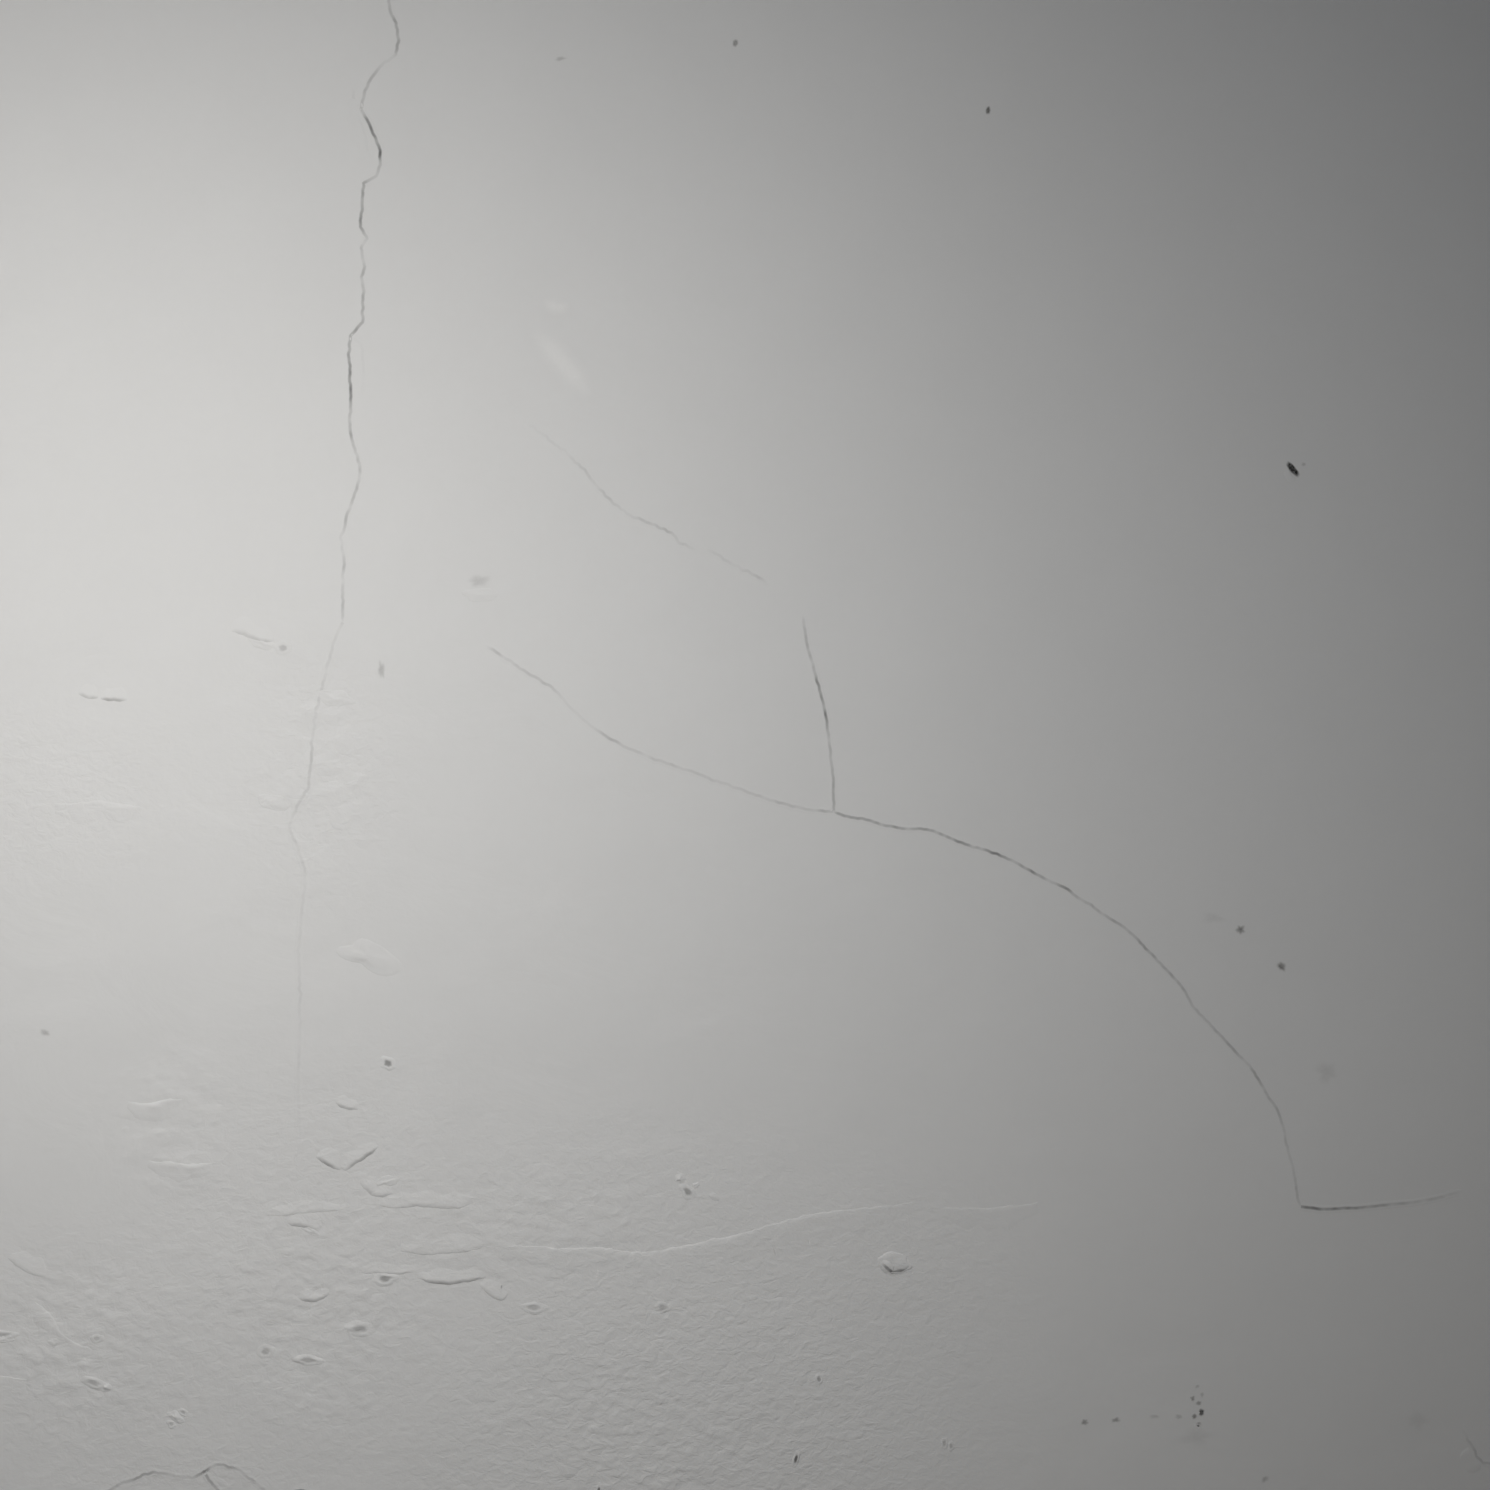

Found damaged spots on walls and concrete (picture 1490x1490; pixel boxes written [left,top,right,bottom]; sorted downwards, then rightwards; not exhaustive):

crack [285,0,403,1178]
crack [484,613,1462,1213]
crack [100,1461,313,1490]